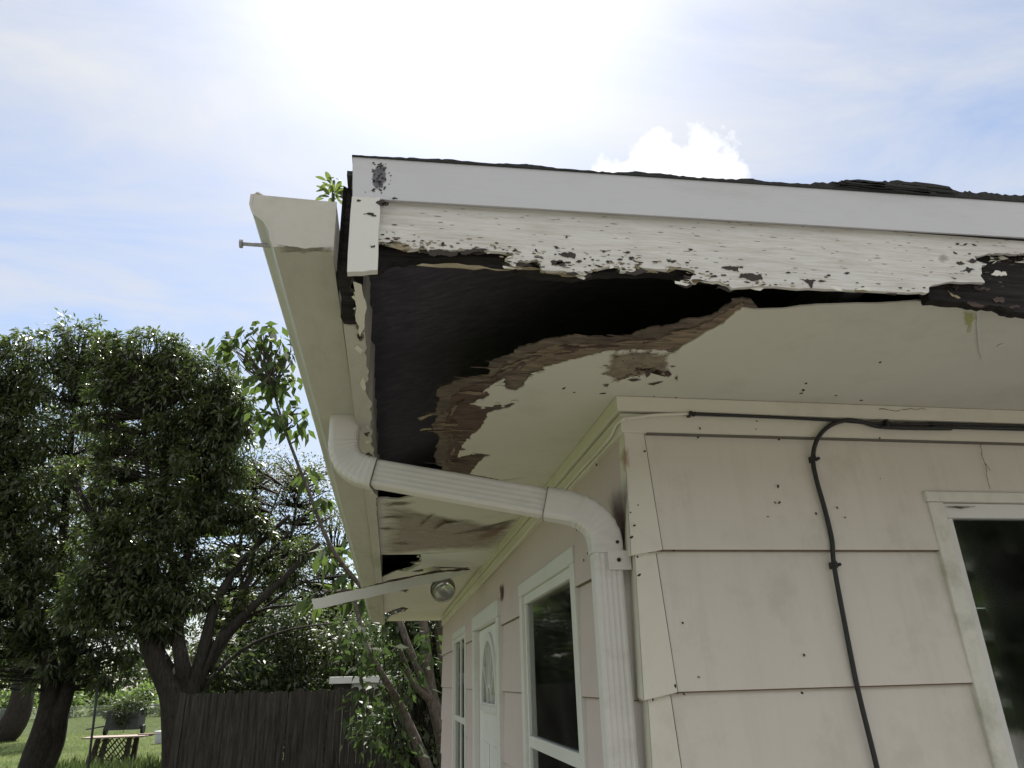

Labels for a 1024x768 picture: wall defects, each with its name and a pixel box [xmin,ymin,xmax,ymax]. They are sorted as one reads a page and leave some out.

peeling [370,211,933,296]
peeling [946,238,1024,293]